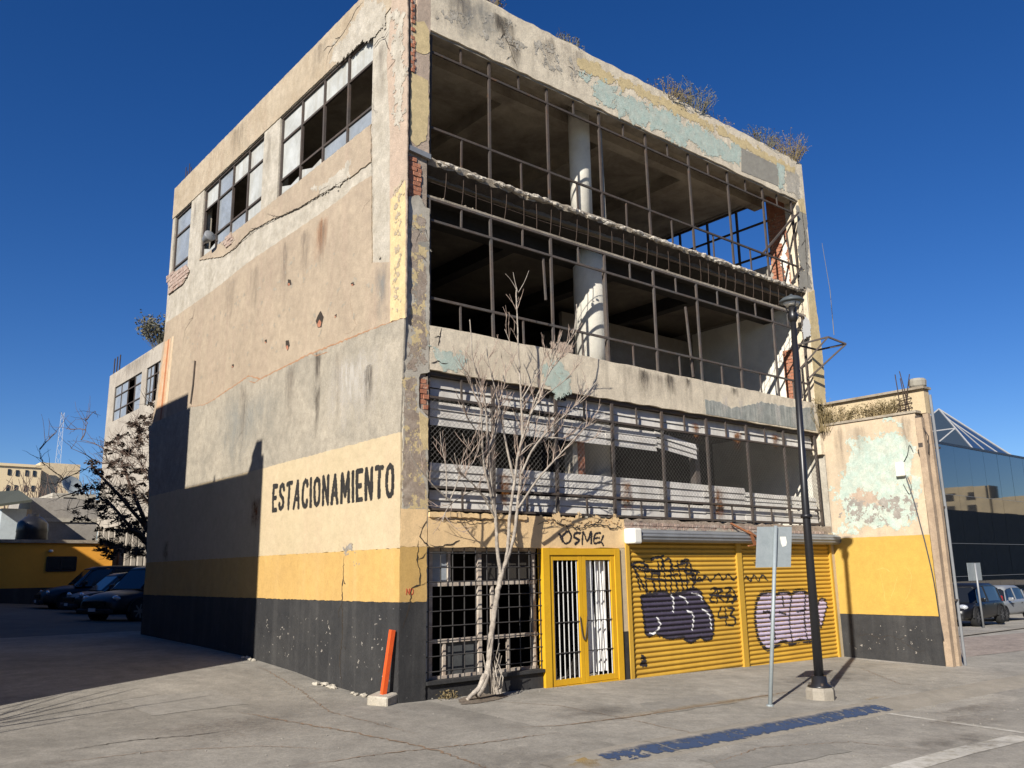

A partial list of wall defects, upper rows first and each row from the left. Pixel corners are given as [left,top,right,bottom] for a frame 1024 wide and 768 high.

spalling [329,0,416,130]
peeling [435,9,795,190]
flaking render [166,264,189,295]
crack [227,179,345,255]
spalling [392,156,816,512]
peeling [792,371,926,535]
crack [403,516,503,627]
flaking render [539,511,757,532]